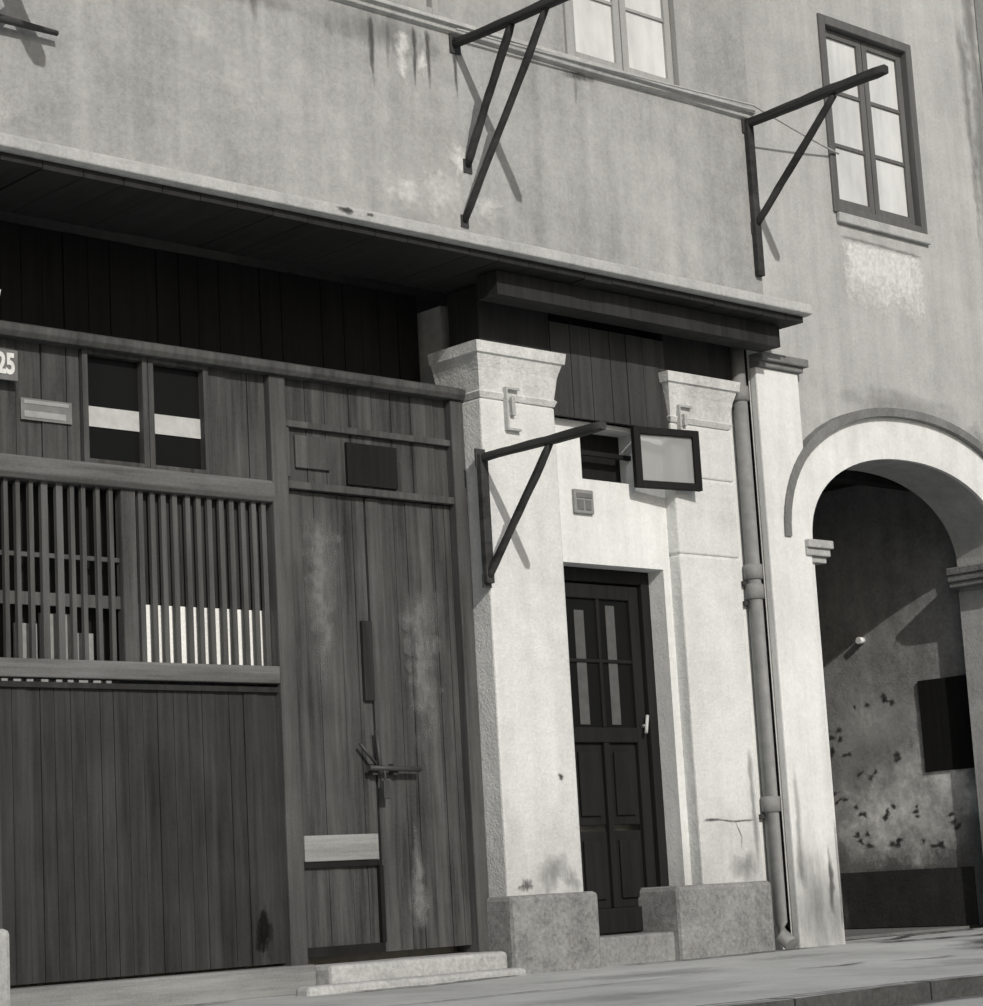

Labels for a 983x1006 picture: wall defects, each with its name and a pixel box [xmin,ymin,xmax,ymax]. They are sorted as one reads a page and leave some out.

damp [413,31,430,75]